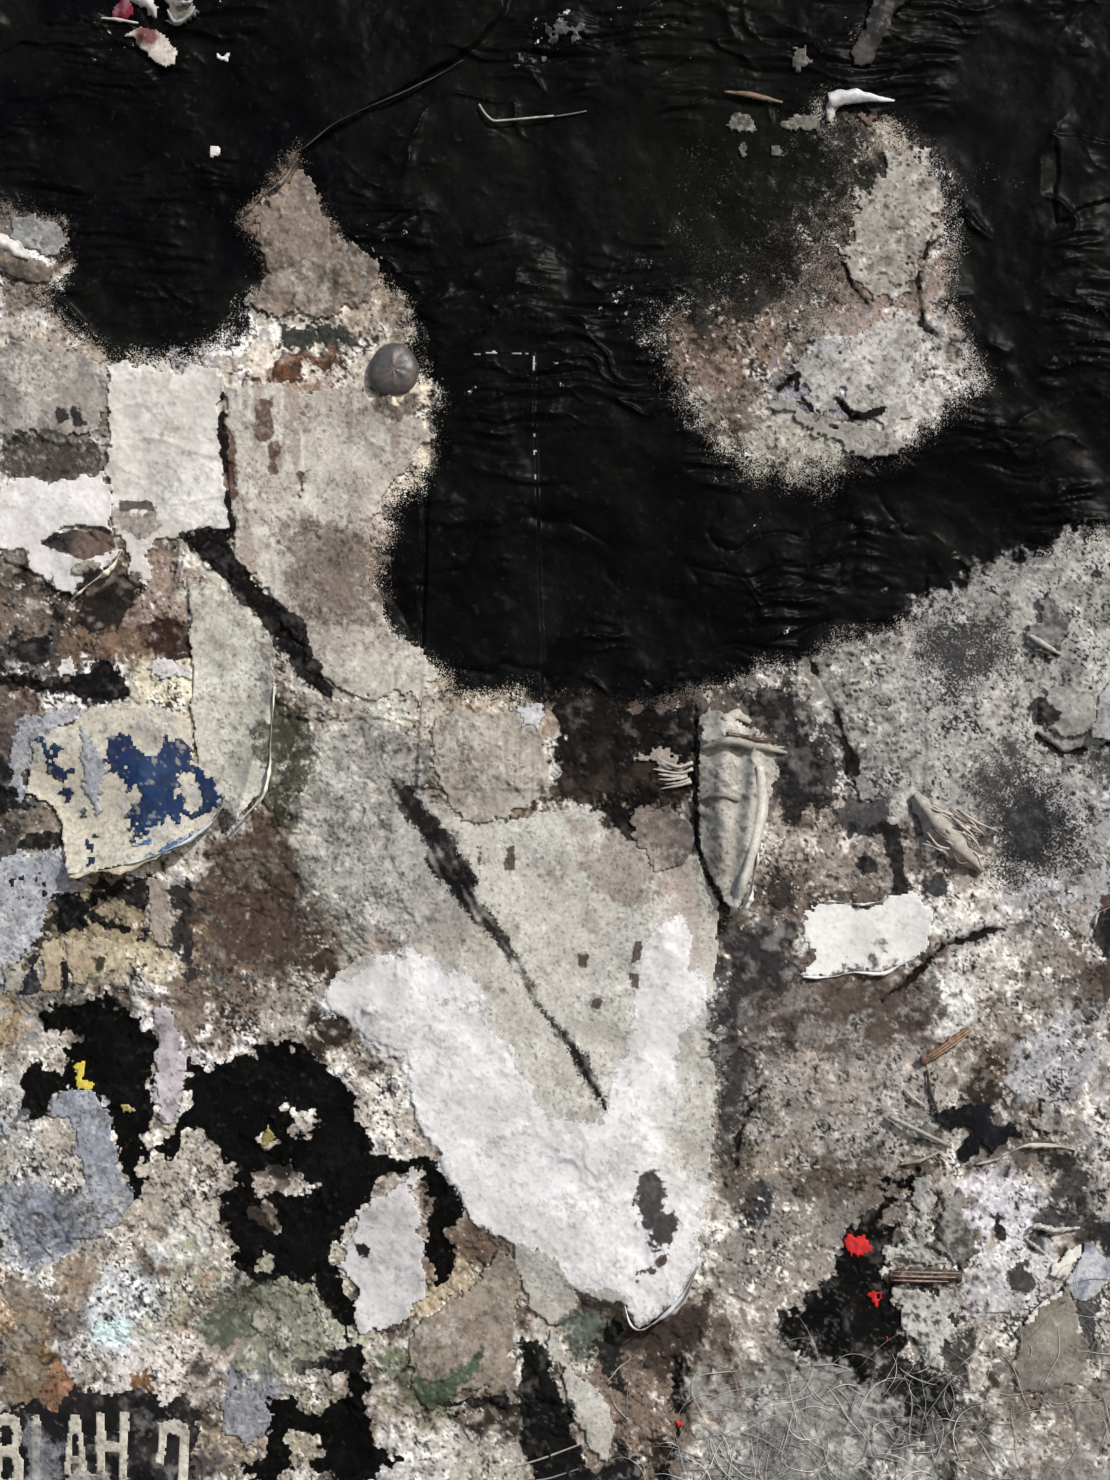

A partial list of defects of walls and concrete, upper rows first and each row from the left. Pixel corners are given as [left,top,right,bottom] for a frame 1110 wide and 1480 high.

peeling [0,340,439,706]
peeling [430,707,555,824]
peeling [629,802,697,872]
peeling [801,891,933,979]
crack [881,926,1004,1003]
peeling [337,1166,616,1462]